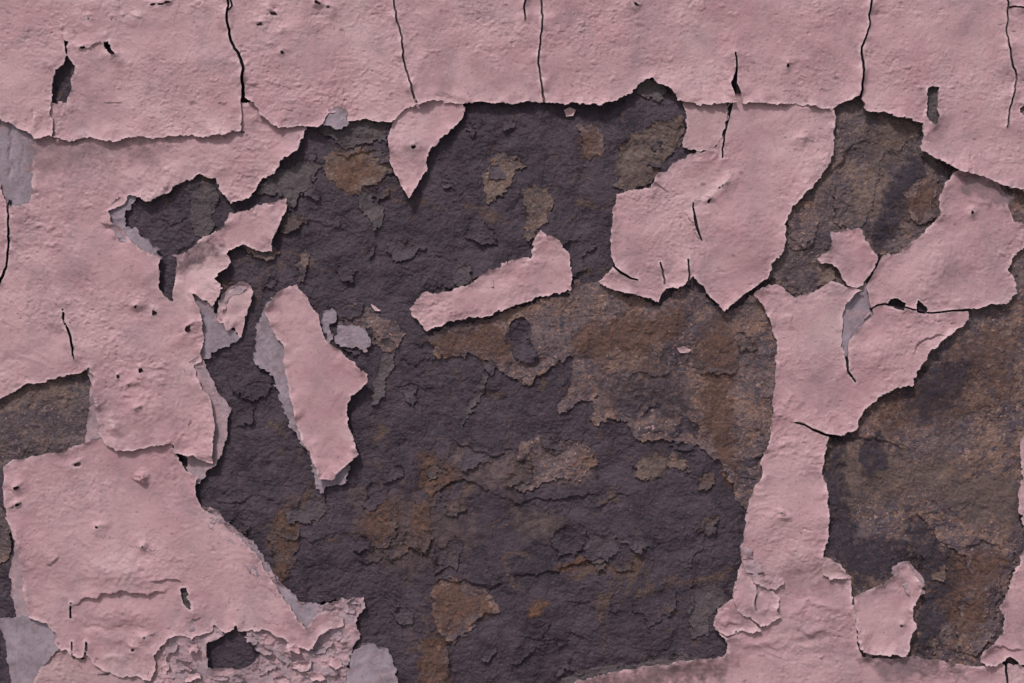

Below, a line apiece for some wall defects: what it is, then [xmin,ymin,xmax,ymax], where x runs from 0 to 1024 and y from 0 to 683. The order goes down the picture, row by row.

spalling [51,41,75,104]
crack [226,0,246,103]
crack [393,0,418,103]
crack [523,0,545,102]
crack [721,53,740,158]
crack [858,0,873,98]
crack [0,200,12,283]
crack [864,254,968,314]
peeling [999,184,1024,224]
peeling [108,78,958,683]
peeling [822,248,1024,667]
peeling [0,367,100,683]